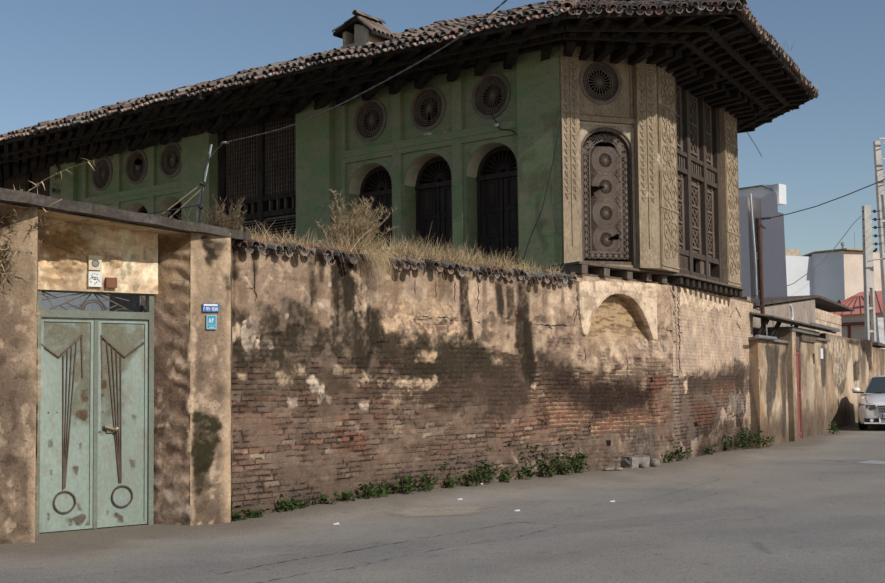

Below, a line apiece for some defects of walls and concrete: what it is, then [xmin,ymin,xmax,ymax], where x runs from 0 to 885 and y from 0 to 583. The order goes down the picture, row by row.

flaking render [275,364,330,403]
leakage [231,257,537,420]
flaking render [357,373,437,391]
flaking render [382,298,463,339]
flaking render [419,351,437,361]
crack [673,288,682,374]
leakage [687,359,750,394]
leakage [766,342,786,437]
leakage [822,338,872,394]
spalling [543,376,668,446]
spalling [336,430,369,452]
leakage [696,420,752,456]